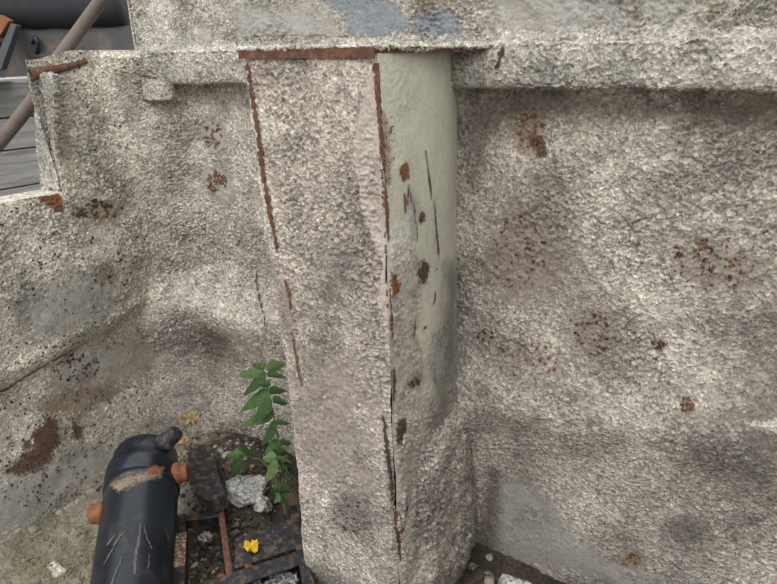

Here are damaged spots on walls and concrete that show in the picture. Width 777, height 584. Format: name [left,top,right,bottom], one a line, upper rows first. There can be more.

corrosion [199,119,226,153]
corrosion [245,62,278,253]
corrosion [372,63,411,242]
corrosion [507,109,547,158]
corrosion [38,189,63,213]
corrosion [203,167,234,208]
corrosion [680,396,694,412]
corrosion [5,383,119,478]
crack [380,369,408,561]